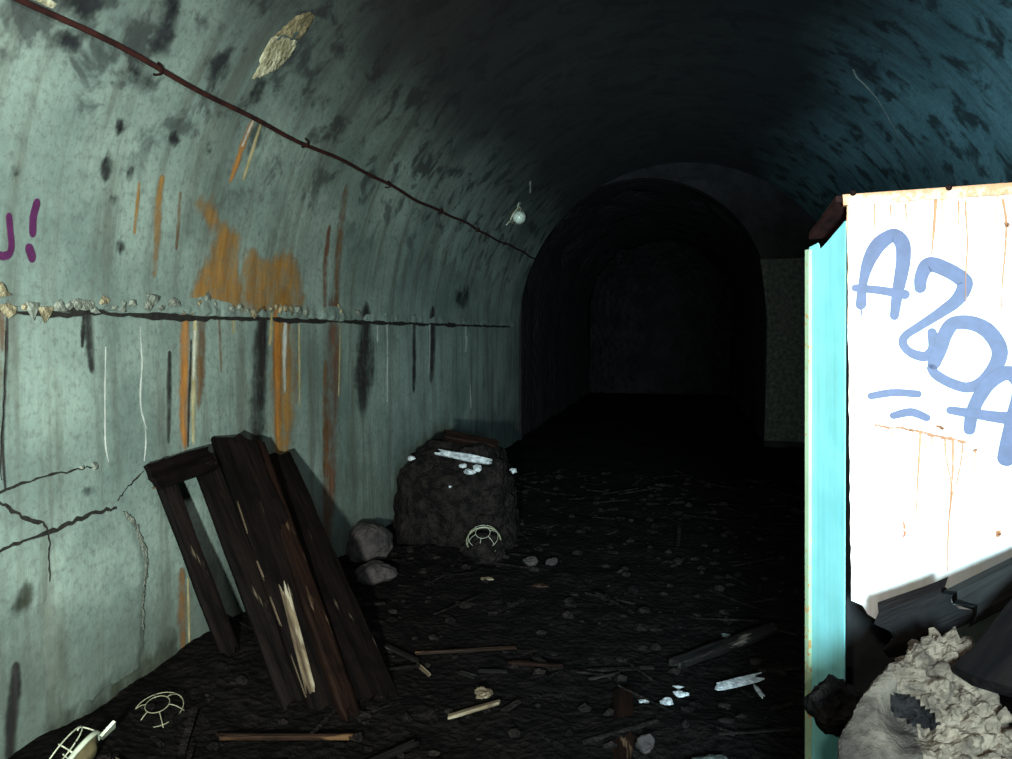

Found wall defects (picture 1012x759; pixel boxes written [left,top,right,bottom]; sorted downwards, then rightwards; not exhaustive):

water stain [54,30,78,48]
water stain [69,0,100,19]
water stain [150,0,178,52]
spalling [252,11,315,79]
water stain [251,81,265,100]
water stain [101,157,110,181]
corrosion [180,314,204,447]
crack [0,330,144,582]